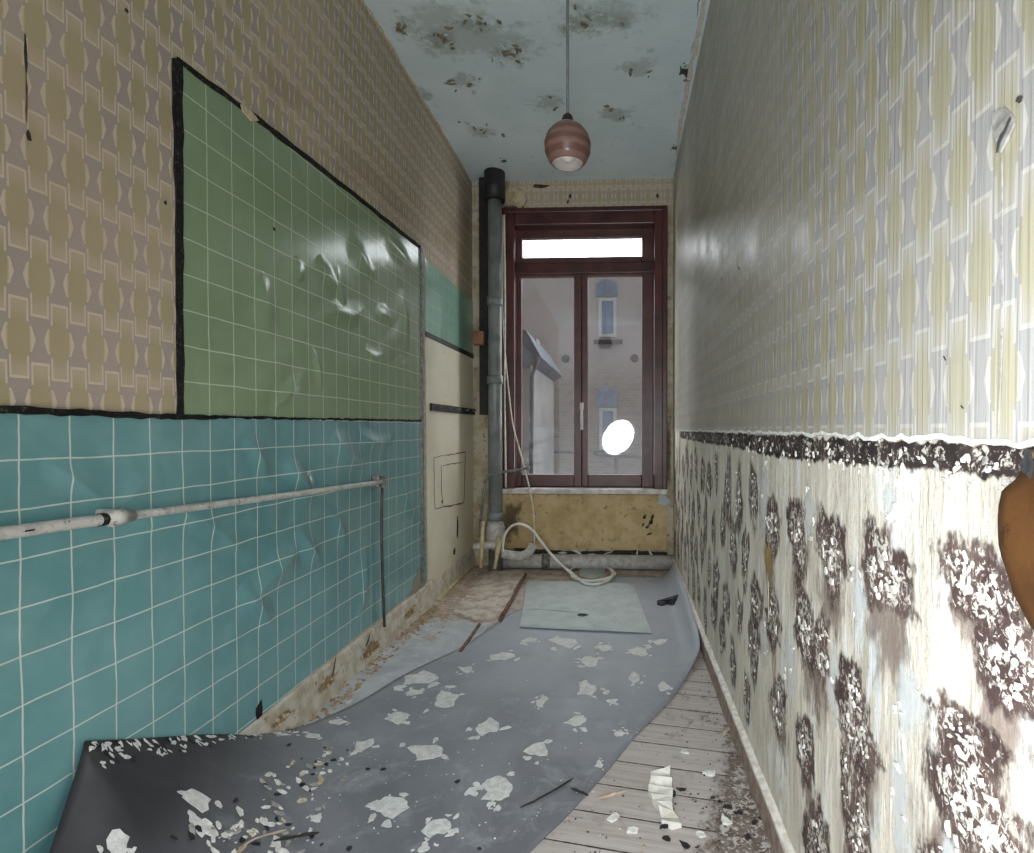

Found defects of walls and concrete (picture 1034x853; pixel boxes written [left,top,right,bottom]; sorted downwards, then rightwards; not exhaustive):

damp [503,504,521,535]
peeling [791,486,839,585]
peeling [702,438,1011,553]
peeling [850,551,898,619]
spalling [362,637,380,658]
peeling [708,561,869,759]
peeling [892,664,924,730]
peeling [992,644,1034,702]
peeling [938,707,1001,853]
spalling [662,830,706,849]
spalling [710,796,761,840]